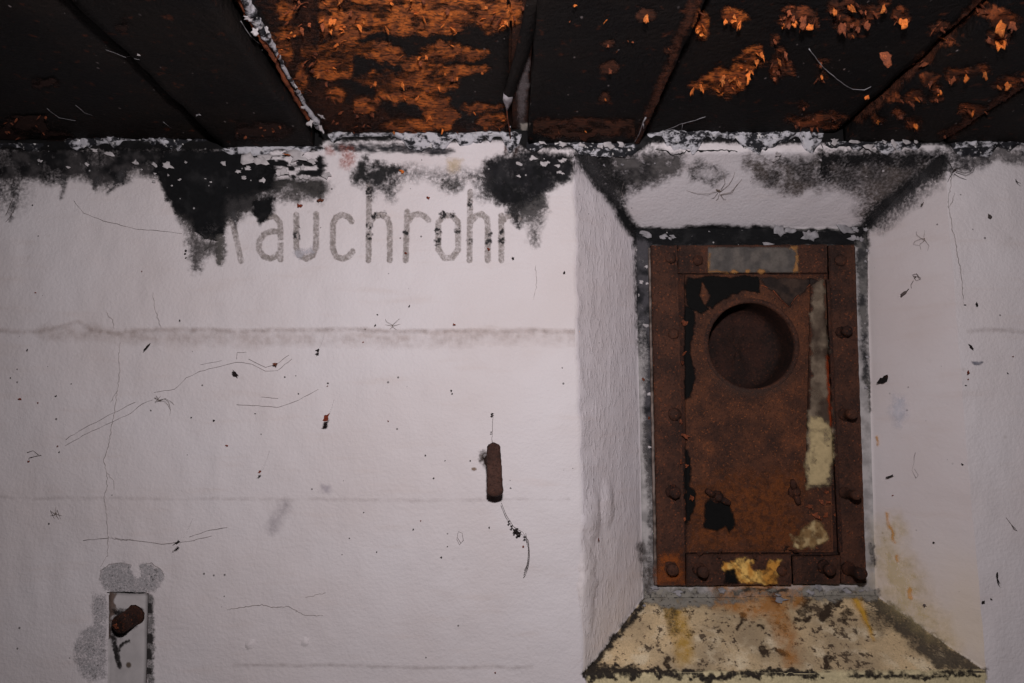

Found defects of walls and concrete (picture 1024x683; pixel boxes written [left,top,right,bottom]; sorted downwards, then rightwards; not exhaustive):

rust [238,0,524,135]
rust [688,0,911,99]
rust [787,0,1024,139]
water stain [216,234,225,265]
water stain [252,197,275,224]
water stain [861,153,949,229]
crack [101,311,131,566]
water stain [587,669,987,683]